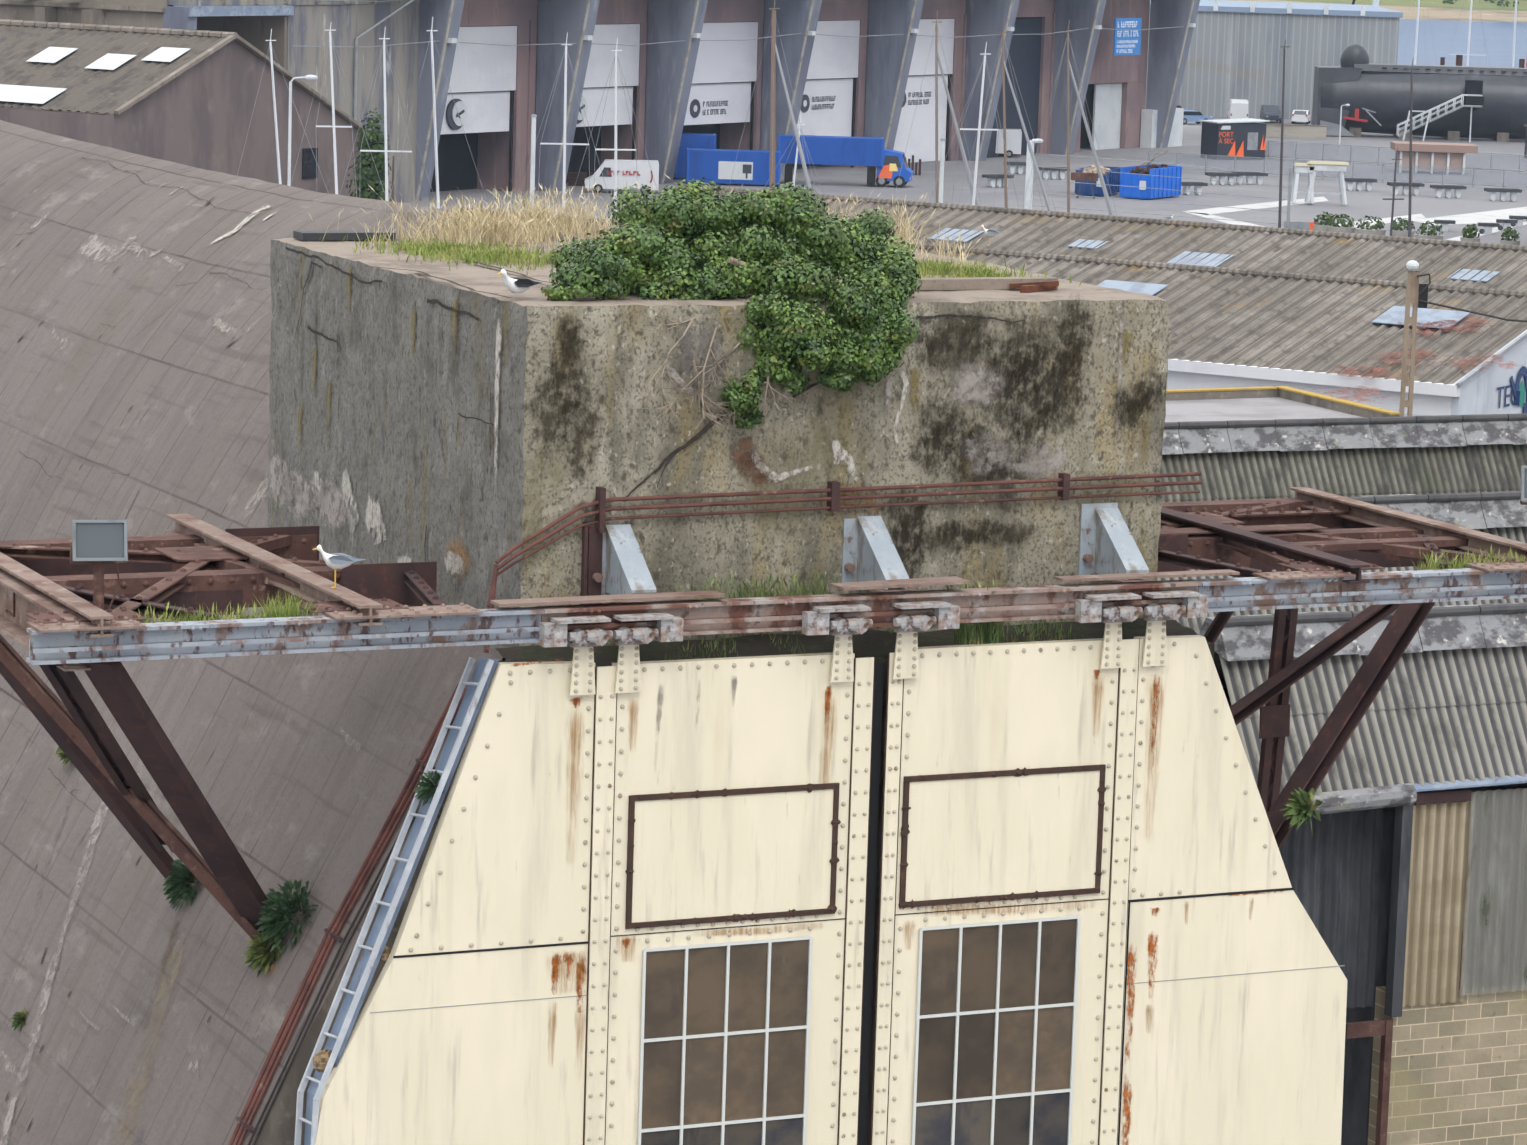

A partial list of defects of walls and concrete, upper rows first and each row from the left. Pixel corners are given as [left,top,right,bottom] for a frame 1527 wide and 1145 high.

damp [886,368,920,443]
damp [957,366,1003,404]
efflorescence [832,440,855,476]
damp [964,436,1065,477]
rust [571,698,580,786]
rust [824,687,833,771]
rust [551,954,586,1039]
rust [1125,934,1158,1055]
rust [1123,1085,1132,1145]